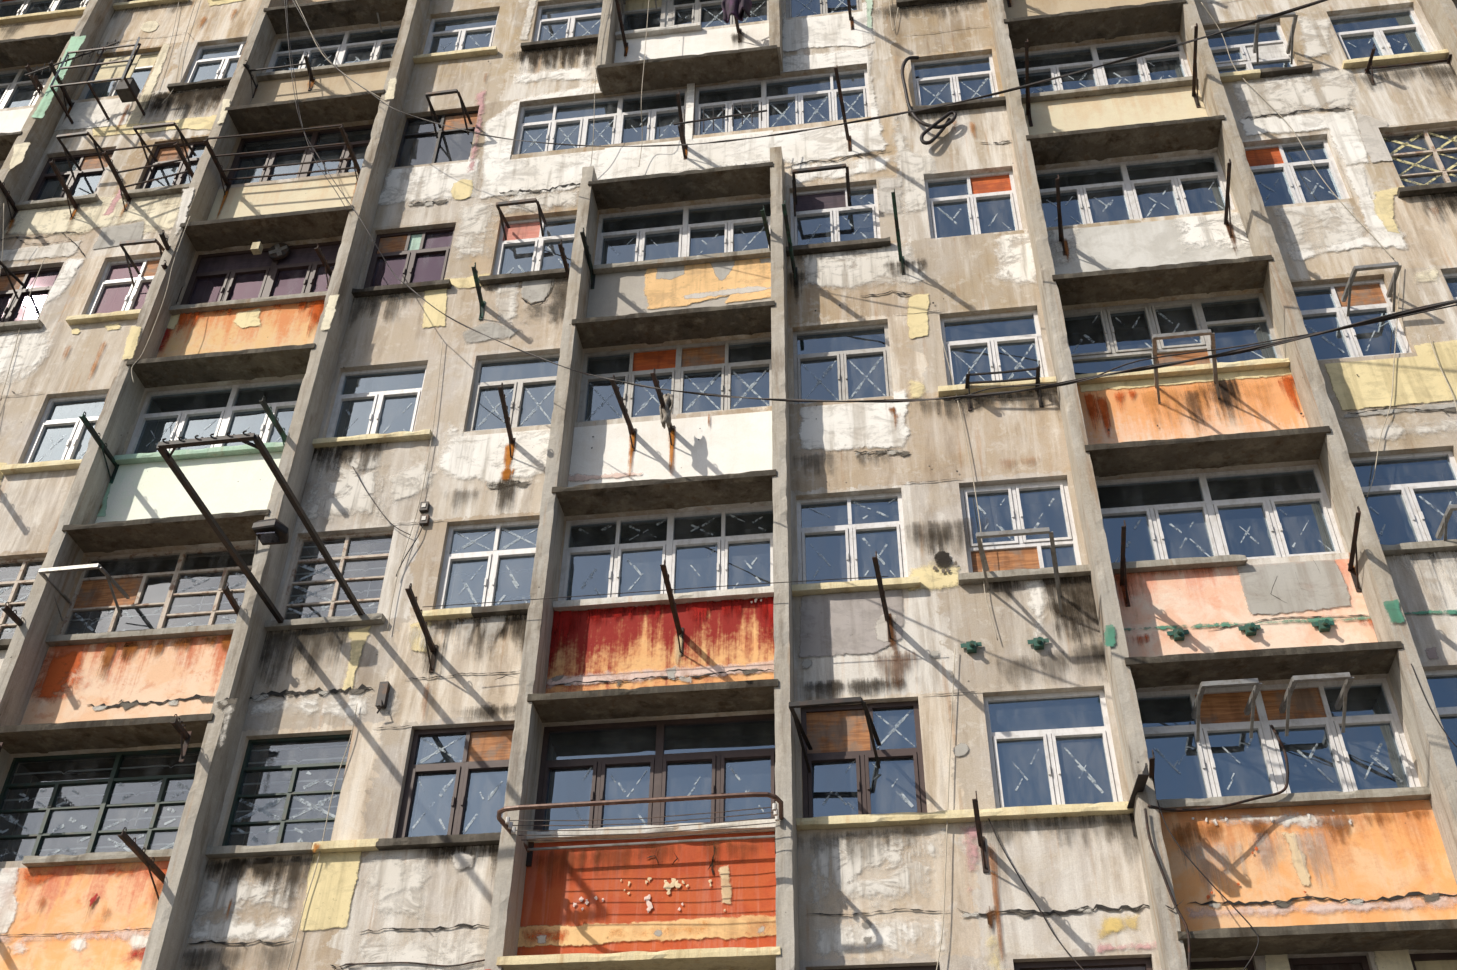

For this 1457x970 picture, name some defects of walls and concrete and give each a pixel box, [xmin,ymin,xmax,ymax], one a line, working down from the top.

peeling [378,2,934,258]
corrosion [299,300,325,334]
corrosion [1084,391,1136,436]
corrosion [1278,376,1299,411]
corrosion [501,444,514,480]
corrosion [550,597,774,663]
damp [992,580,1018,595]
damp [1043,575,1098,640]
corrosion [98,635,232,675]
damp [260,626,349,681]
damp [805,651,916,696]
peeling [517,865,776,947]